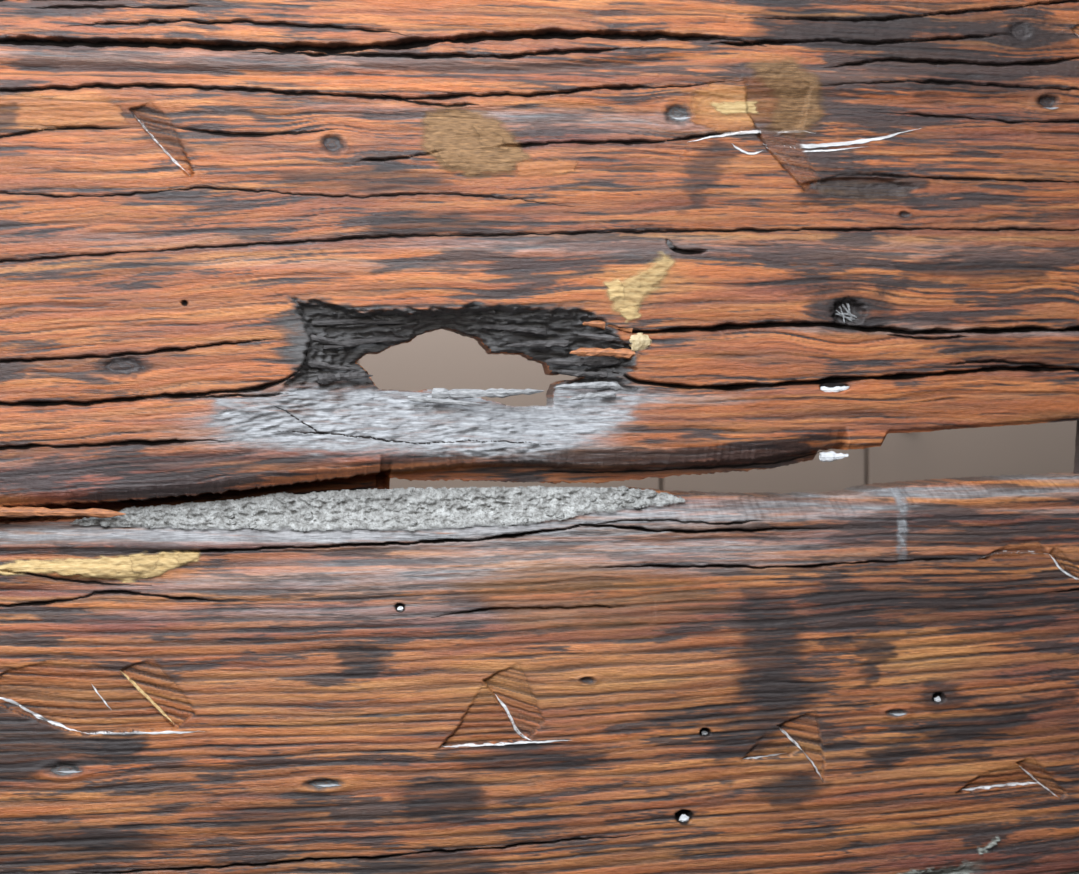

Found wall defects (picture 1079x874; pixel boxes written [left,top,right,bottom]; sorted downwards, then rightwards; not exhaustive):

crack [0,0,1079,91]
crack [0,80,743,108]
crack [885,112,1079,124]
spalling [278,297,640,389]
crack [605,323,1079,390]
spalling [0,658,205,734]
spalling [441,665,569,747]
spalling [744,712,823,781]
spalling [961,756,1064,798]